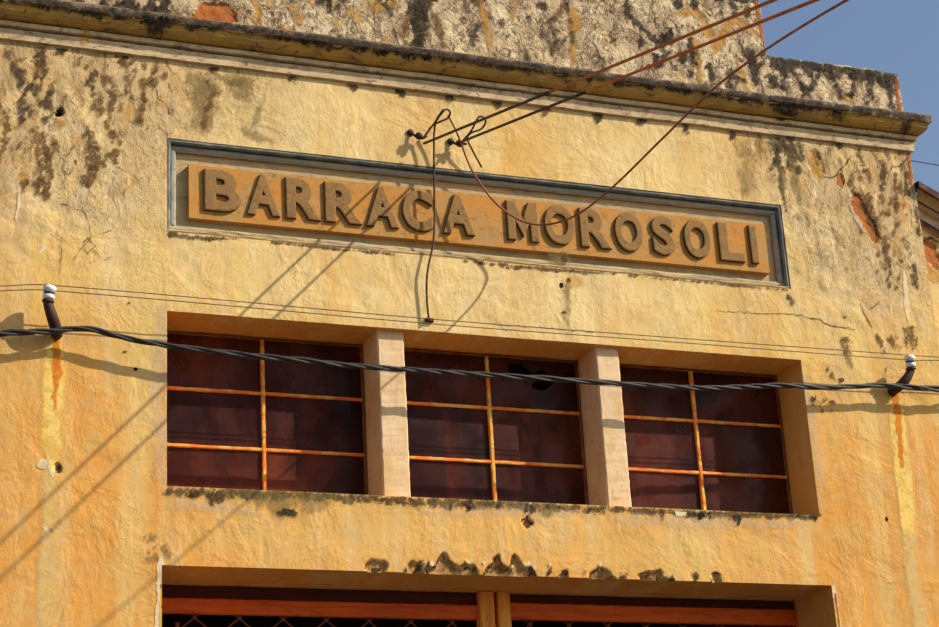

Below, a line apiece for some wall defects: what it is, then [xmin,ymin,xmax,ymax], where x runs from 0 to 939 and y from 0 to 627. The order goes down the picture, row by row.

spalling [192,2,238,23]
leakage [0,46,68,160]
leakage [76,55,168,172]
leakage [0,0,927,139]
crack [56,188,126,271]
spalling [806,148,883,244]
crack [711,301,879,333]
rust [36,325,66,627]
leakage [164,486,821,525]
rust [889,394,927,627]
spalling [404,552,568,578]
spalling [585,562,675,582]